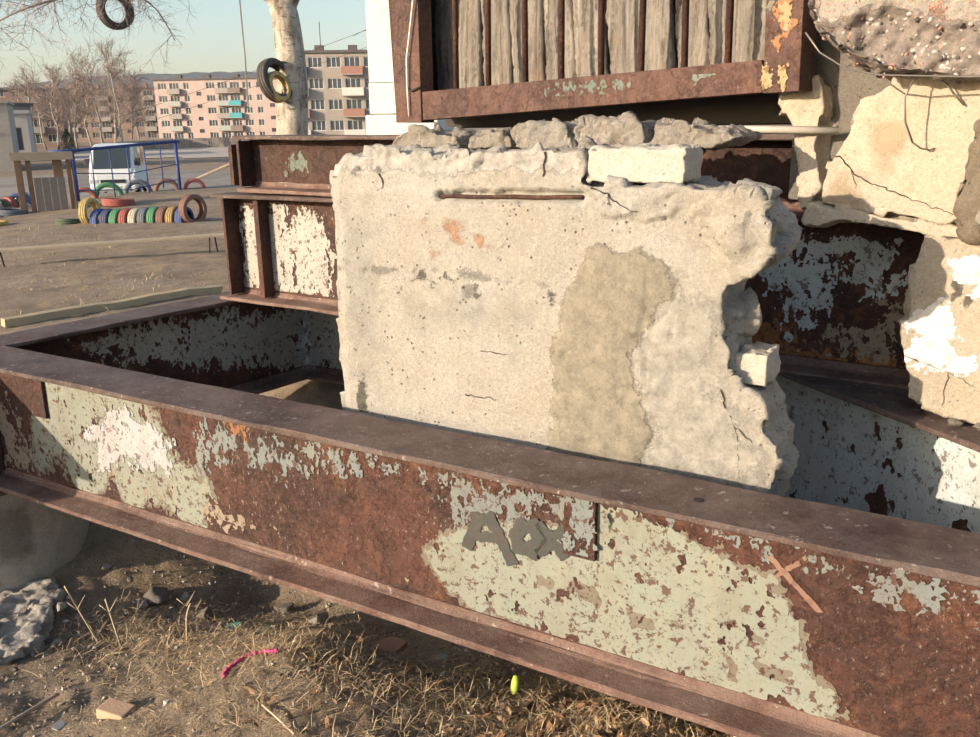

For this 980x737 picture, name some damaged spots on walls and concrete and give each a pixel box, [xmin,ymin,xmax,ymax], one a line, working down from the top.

corrosion [764,0,802,53]
corrosion [761,62,789,93]
spalling [331,142,582,178]
crack [835,156,953,215]
peeling [239,203,260,288]
peeling [268,202,337,297]
peeling [67,304,343,375]
corrosion [752,318,905,368]
peeling [759,232,980,378]
corrosion [224,422,250,458]
peeling [776,375,980,534]
peeling [0,382,853,722]